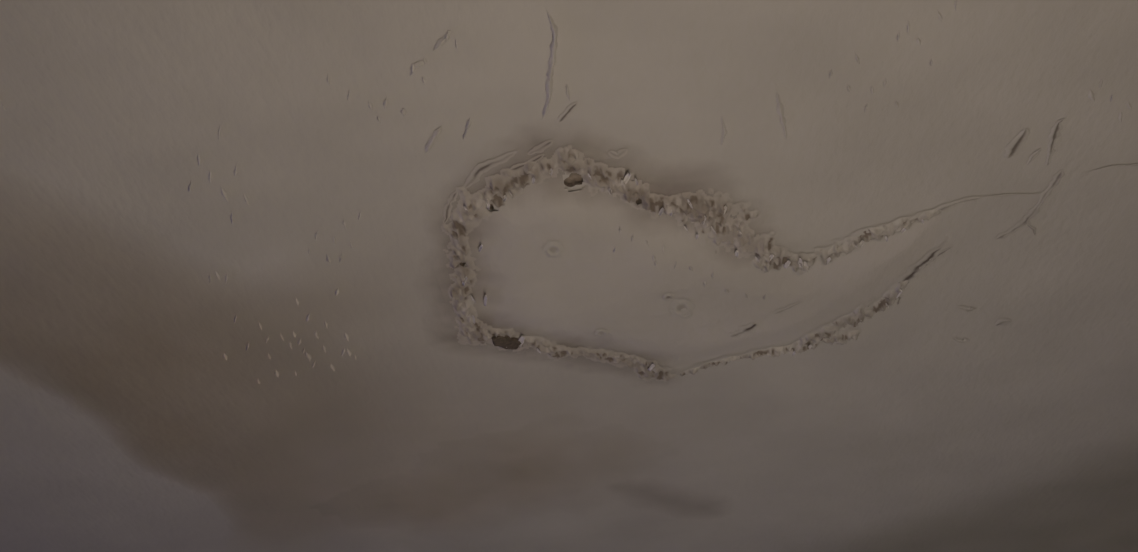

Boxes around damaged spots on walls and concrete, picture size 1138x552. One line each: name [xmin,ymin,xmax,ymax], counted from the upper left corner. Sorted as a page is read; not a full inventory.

crack [679,118,1138,377]